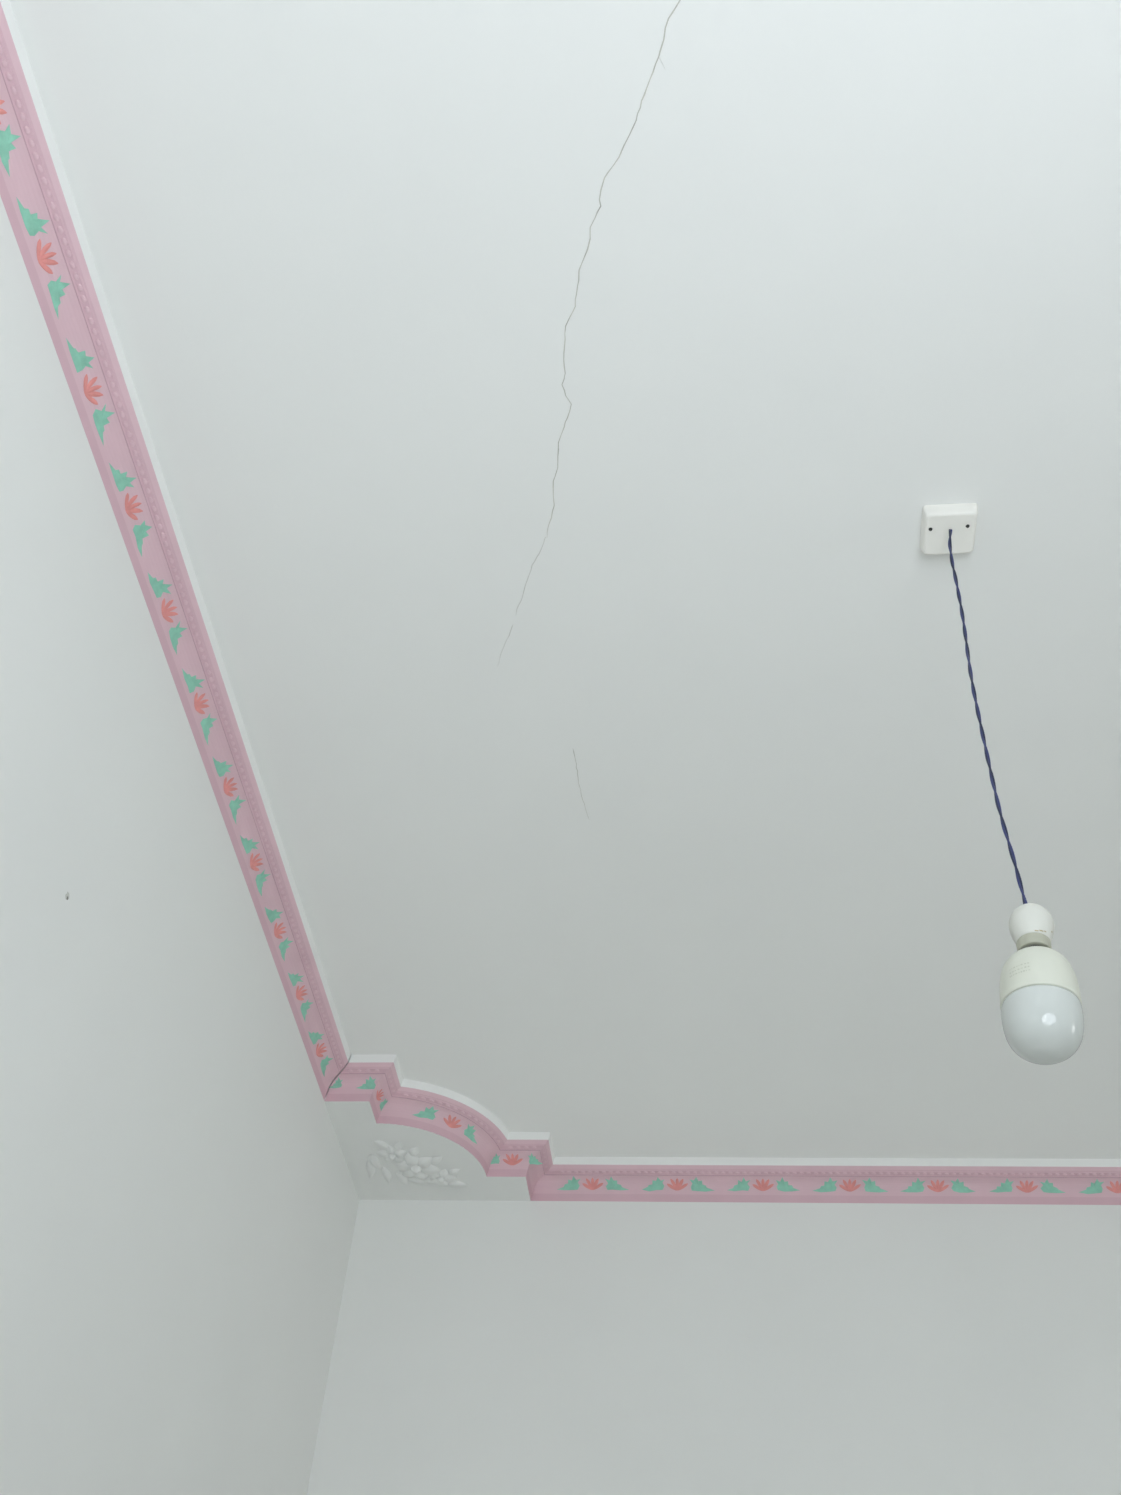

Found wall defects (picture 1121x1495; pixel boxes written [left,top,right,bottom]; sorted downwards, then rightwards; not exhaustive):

crack [498,0,681,664]